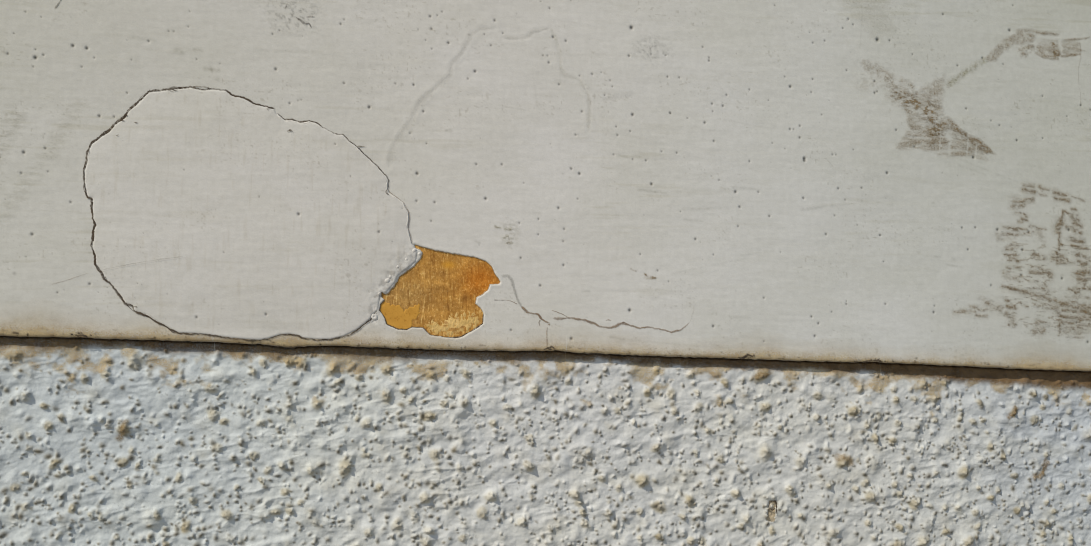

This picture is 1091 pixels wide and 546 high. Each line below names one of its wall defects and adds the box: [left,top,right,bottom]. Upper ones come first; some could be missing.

crack [83,86,413,341]
peeling [369,245,500,338]
crack [511,301,686,334]